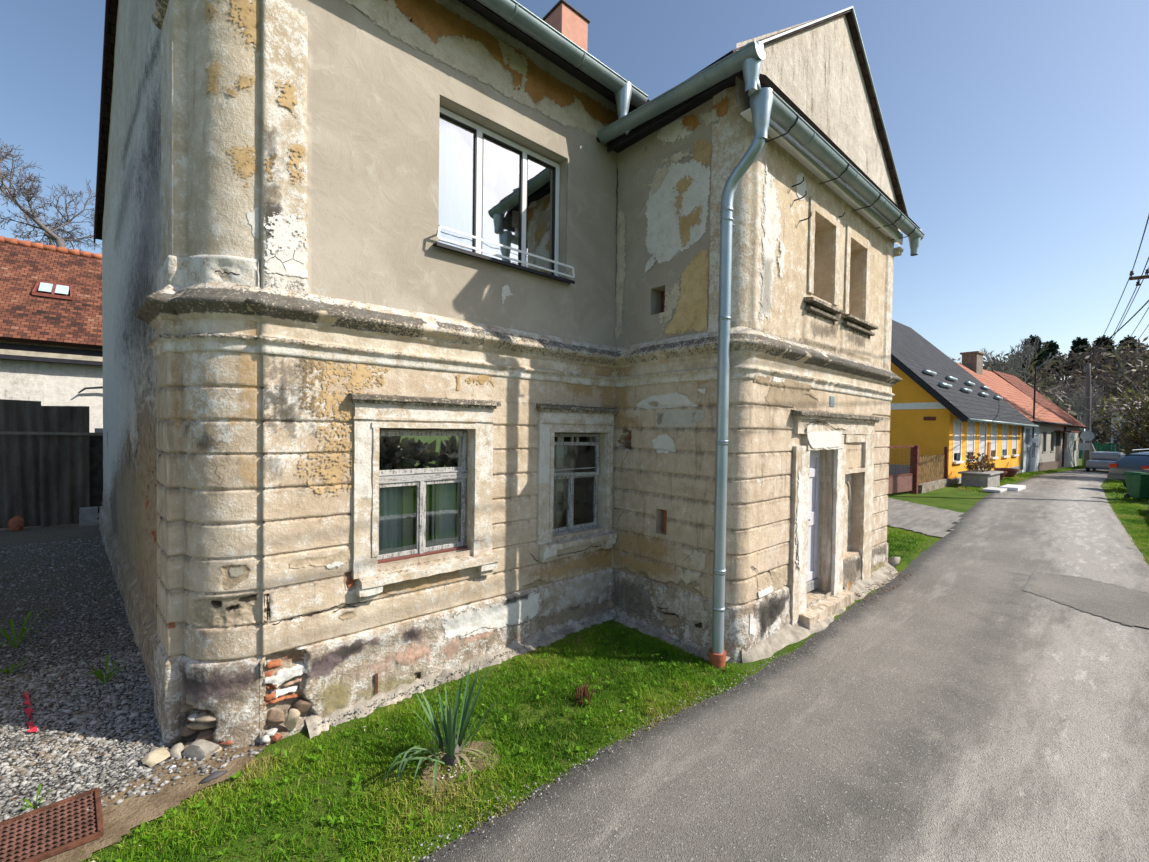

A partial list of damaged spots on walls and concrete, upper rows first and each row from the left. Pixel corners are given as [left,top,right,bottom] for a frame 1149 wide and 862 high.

peeling [203,0,259,52]
peeling [276,80,303,116]
peeling [343,0,617,137]
peeling [226,139,309,187]
peeling [247,207,308,278]
peeling [644,95,727,336]
peeling [295,357,389,499]
peeling [636,388,706,454]
spalling [191,564,271,628]
leakage [754,594,790,637]
flaking render [261,649,314,742]
flaking render [180,711,233,754]